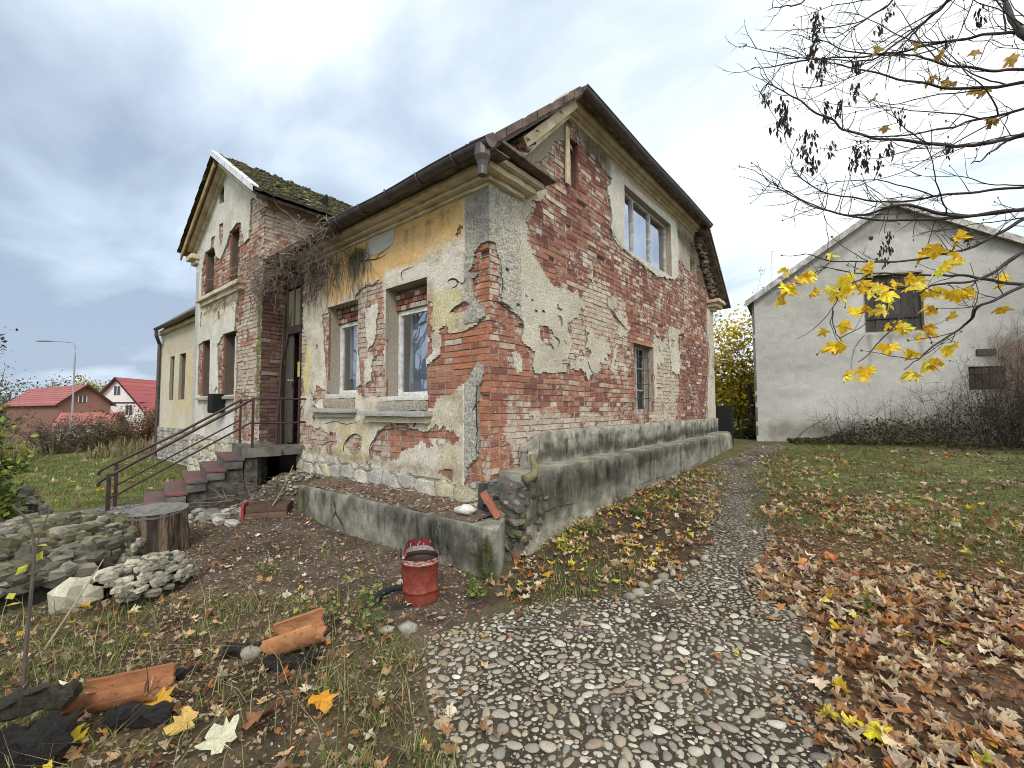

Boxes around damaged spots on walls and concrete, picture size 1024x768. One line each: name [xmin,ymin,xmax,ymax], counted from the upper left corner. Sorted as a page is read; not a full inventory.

flaking render [203,198,459,466]
flaking render [427,120,713,485]
leakage [536,420,717,517]